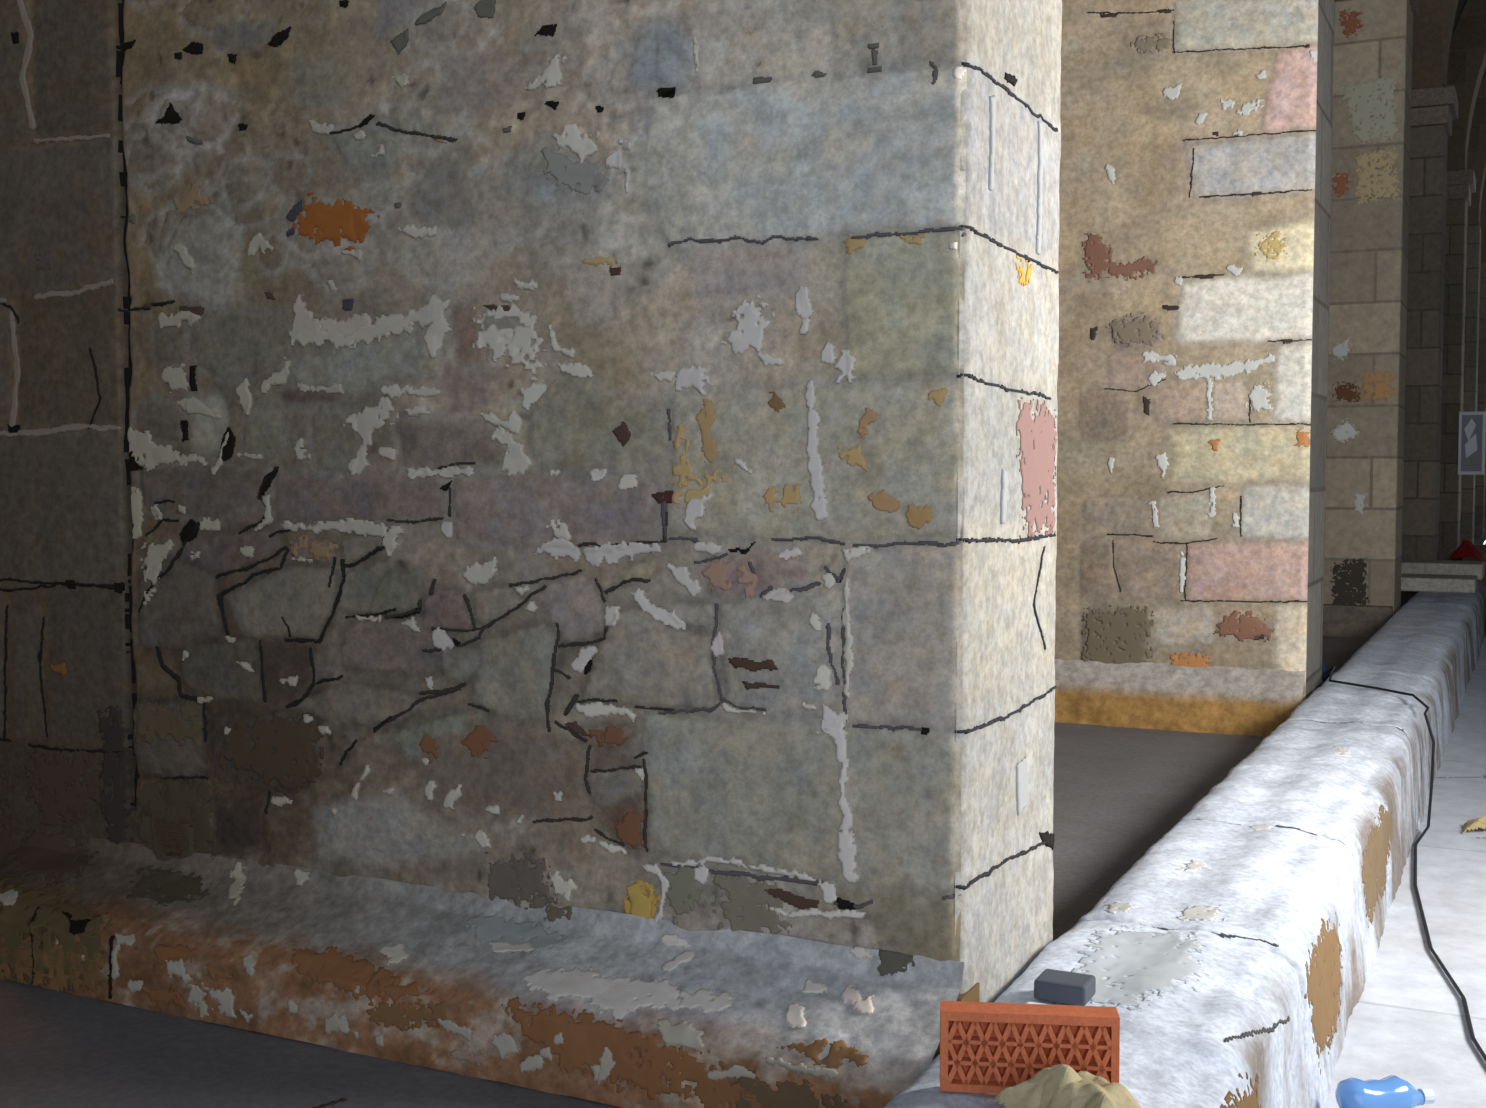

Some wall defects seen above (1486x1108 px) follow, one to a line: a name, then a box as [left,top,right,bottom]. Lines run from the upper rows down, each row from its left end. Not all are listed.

crack [1087,9,1306,54]
spalling [189,365,198,391]
spalling [180,420,189,442]
spalling [220,427,236,461]
spalling [129,451,143,472]
spalling [260,467,279,497]
spalling [179,519,199,543]
crack [1107,486,1307,603]
crack [0,499,200,753]
crack [215,462,1057,909]
crack [155,646,209,780]
spalling [836,897,856,911]